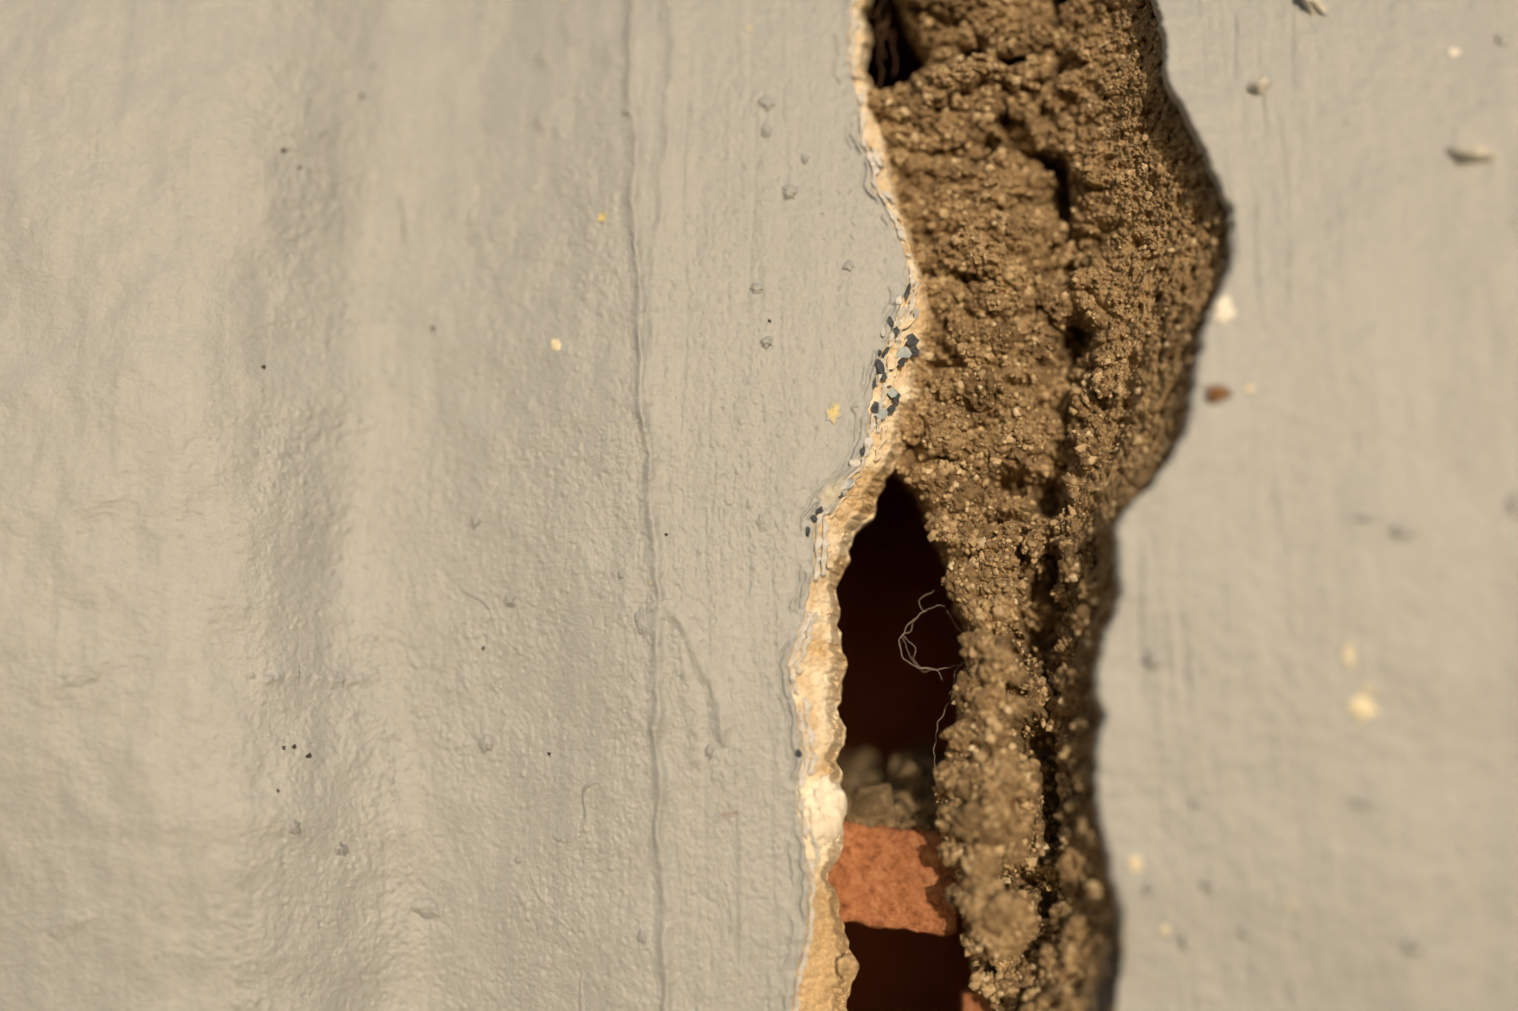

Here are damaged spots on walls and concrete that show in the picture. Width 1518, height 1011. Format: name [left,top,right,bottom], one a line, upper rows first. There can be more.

peeling [871,283,920,419]
peeling [805,437,874,537]